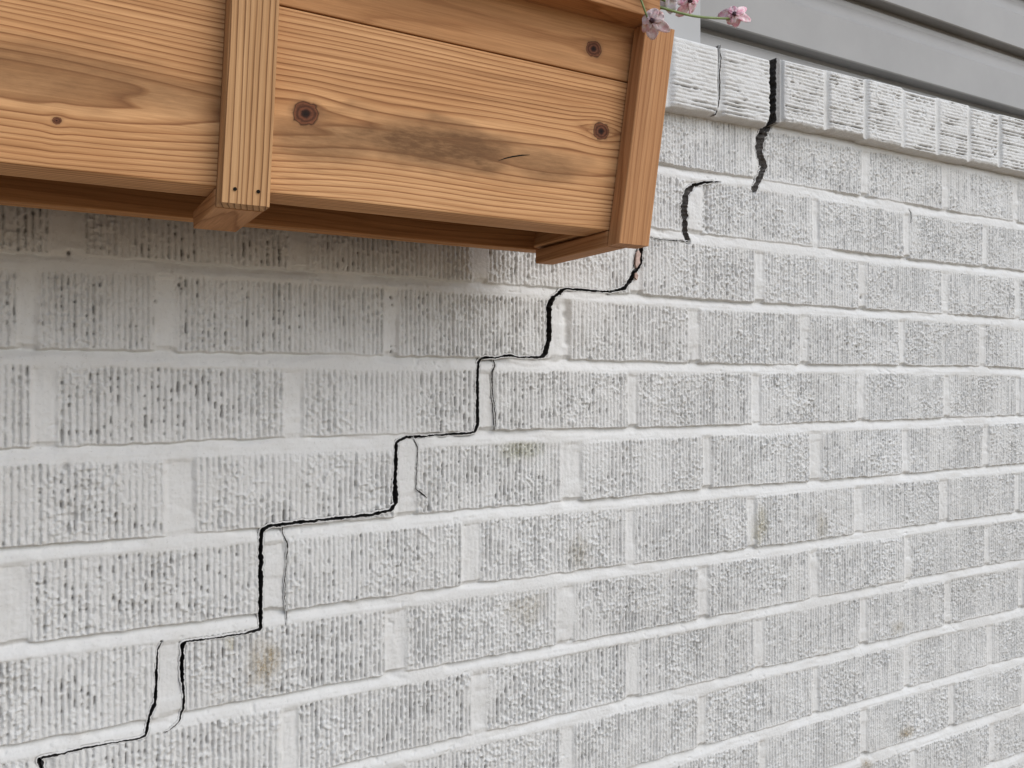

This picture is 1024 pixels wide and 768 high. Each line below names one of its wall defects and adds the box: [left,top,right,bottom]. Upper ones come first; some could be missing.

crack [713,45,722,116]
crack [751,126,771,191]
crack [35,180,720,768]